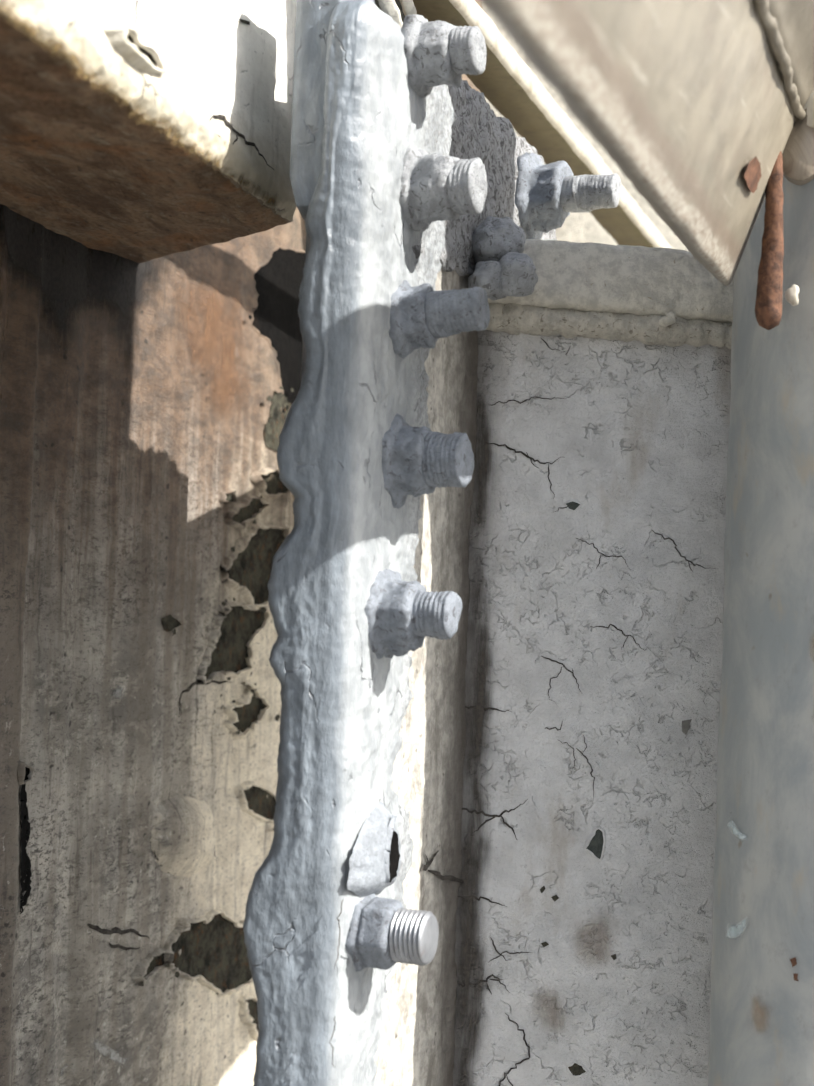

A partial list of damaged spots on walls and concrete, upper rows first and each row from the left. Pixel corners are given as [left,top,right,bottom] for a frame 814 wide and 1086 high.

crack [210,114,274,170]
peeling [249,246,306,453]
crack [489,443,570,512]
peeling [195,466,290,740]
crack [590,624,648,651]
crack [541,656,595,799]
crack [20,783,32,914]
peeling [235,780,276,831]
crack [421,850,507,907]
crack [462,799,528,840]
peeling [129,909,259,1040]
crack [457,937,532,1086]